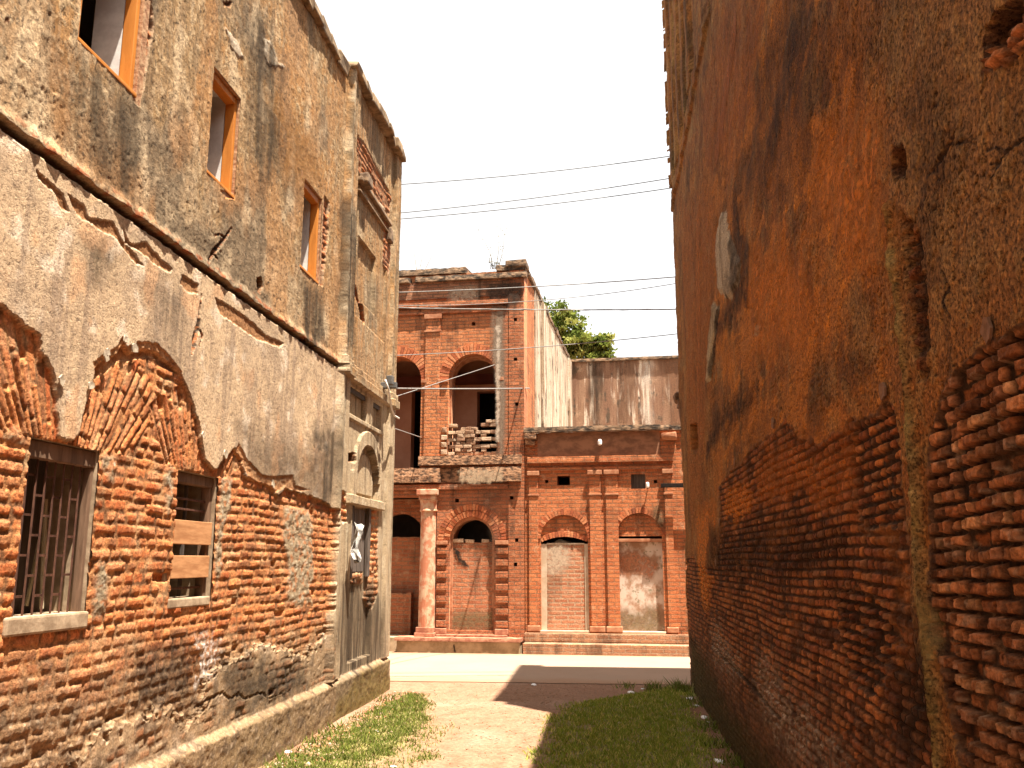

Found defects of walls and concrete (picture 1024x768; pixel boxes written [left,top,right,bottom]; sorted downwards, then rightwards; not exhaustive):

spalling [979,14,1024,79]
peeling [35,168,200,296]
crack [208,226,232,264]
leakage [299,287,317,348]
leakage [708,202,748,376]
leakage [589,362,603,412]
leakage [615,361,635,423]
leakage [663,359,681,425]
spalling [0,296,347,768]
spalling [685,382,933,768]
spalling [925,317,1024,768]
leakage [620,608,659,631]